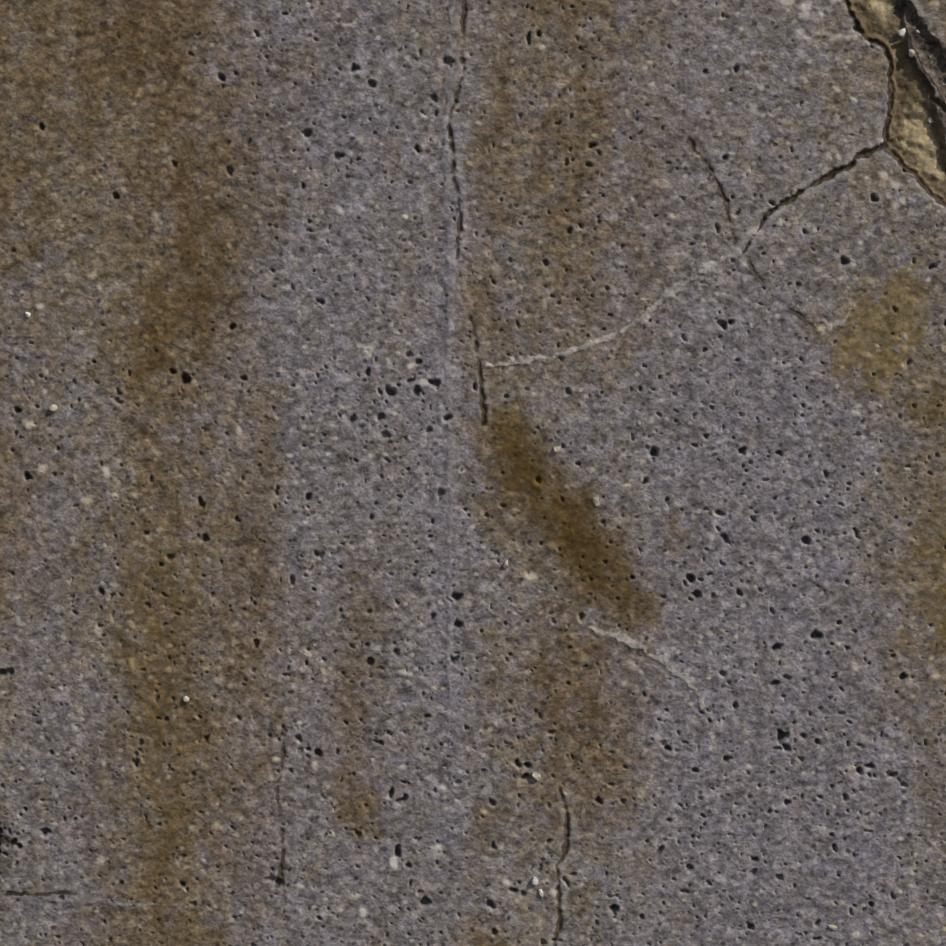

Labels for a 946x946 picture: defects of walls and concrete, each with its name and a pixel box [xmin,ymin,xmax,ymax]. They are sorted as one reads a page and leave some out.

crack [447,0,467,275]
crack [649,0,946,329]
crack [468,316,487,425]
water stain [822,303,855,329]
crack [554,789,569,941]